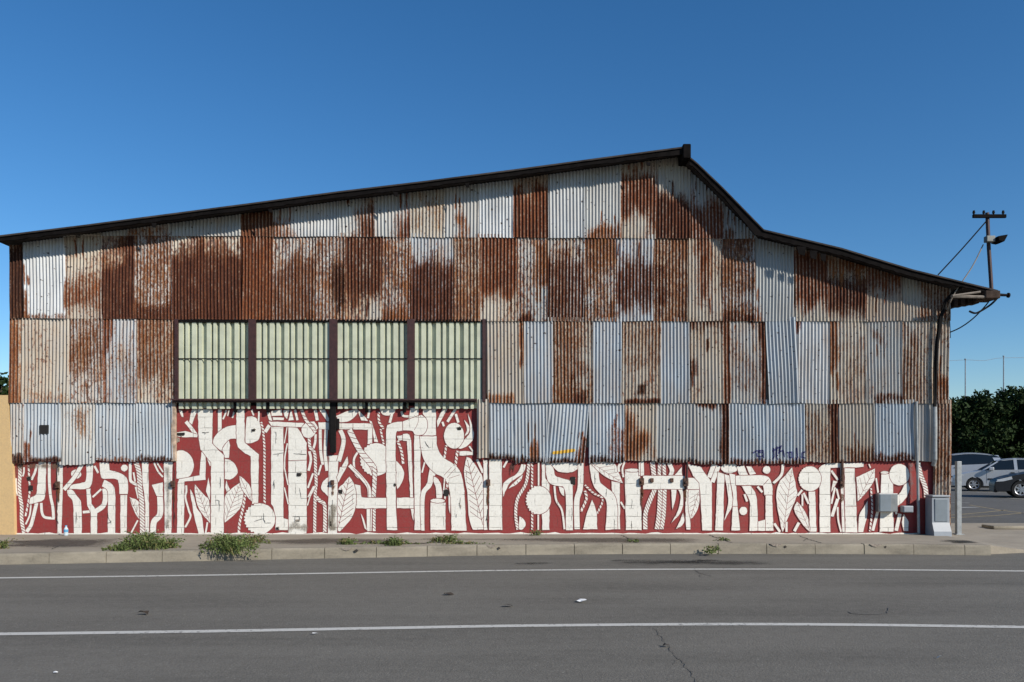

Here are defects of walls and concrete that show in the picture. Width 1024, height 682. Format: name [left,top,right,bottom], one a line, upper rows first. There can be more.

corrosion [9,162,922,465]
corrosion [918,282,950,321]
corrosion [933,356,952,490]